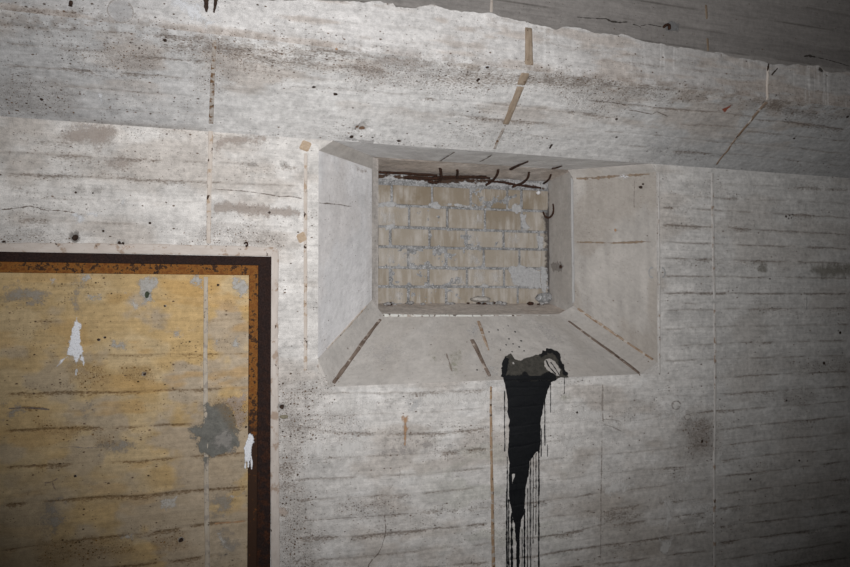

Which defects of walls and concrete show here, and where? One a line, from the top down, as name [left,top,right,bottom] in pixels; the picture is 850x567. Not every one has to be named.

crack [580,17,661,27]